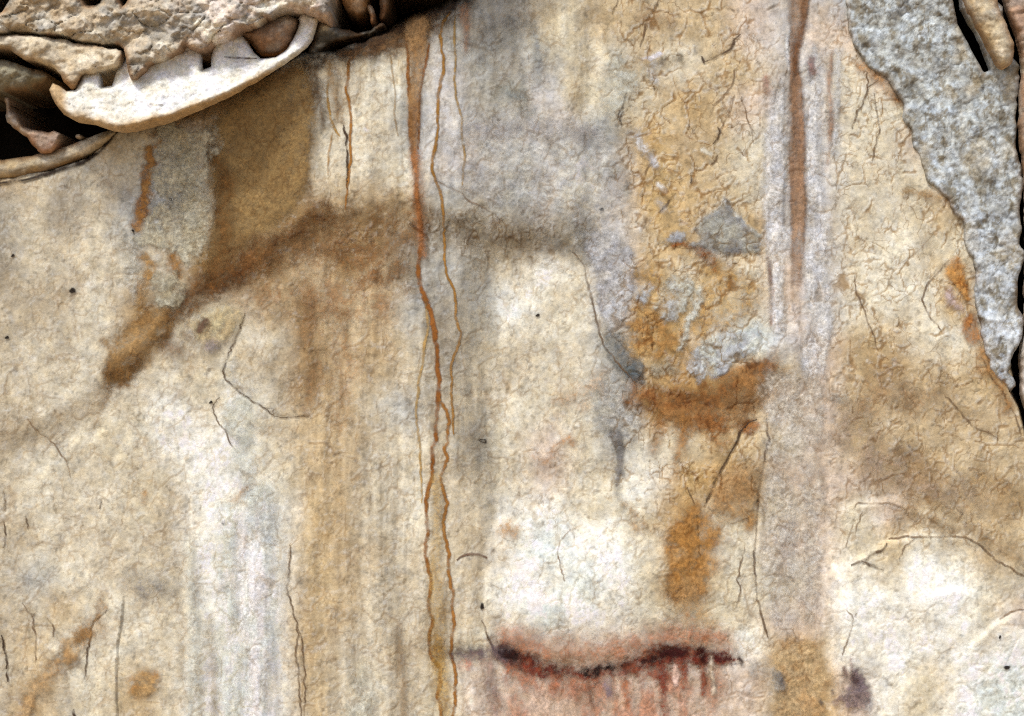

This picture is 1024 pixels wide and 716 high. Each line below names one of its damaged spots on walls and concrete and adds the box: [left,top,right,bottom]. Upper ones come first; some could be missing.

damp [125,60,341,308]
crack [643,10,748,228]
crack [852,73,881,159]
crack [212,313,308,450]
rust [104,11,466,716]
crack [574,253,635,383]
rust [625,242,756,359]
rust [625,358,783,459]
rust [665,463,760,619]
crack [845,502,926,570]
crack [951,508,1024,576]
crack [287,545,306,715]